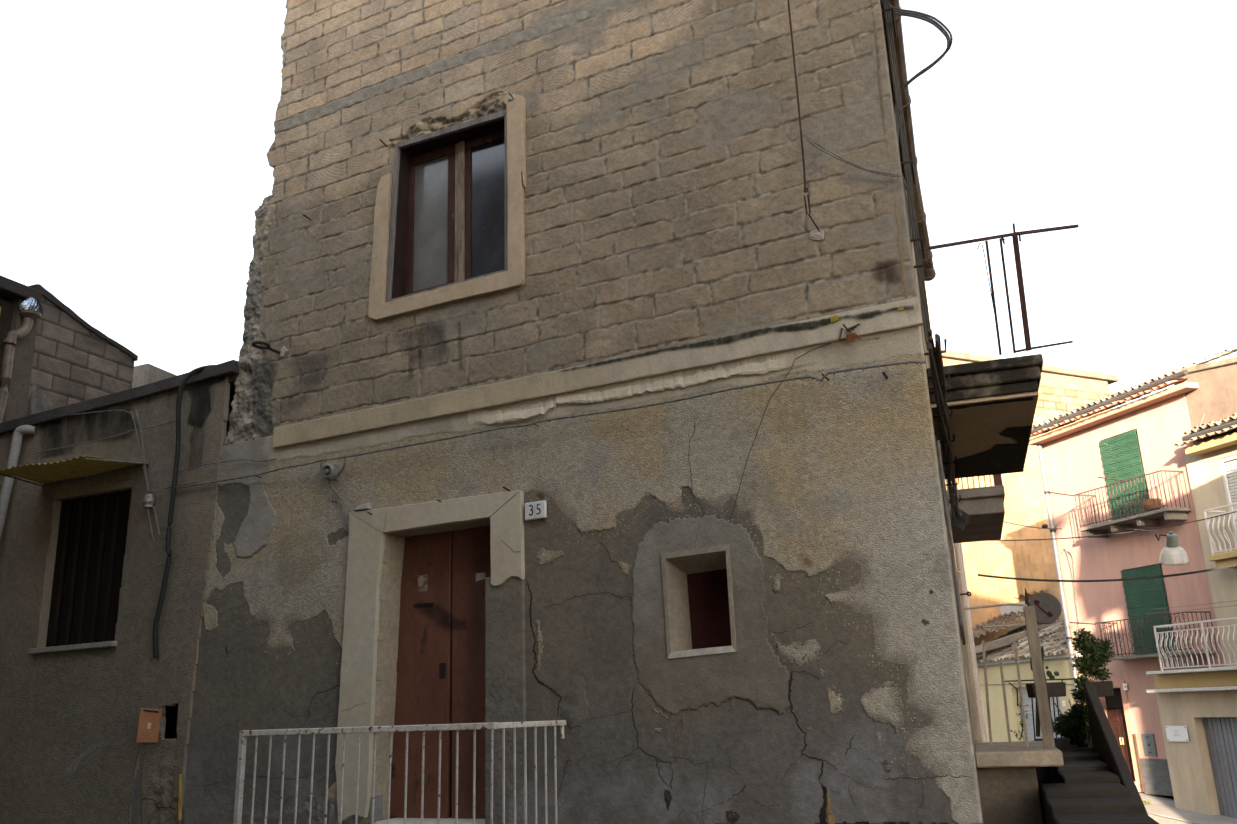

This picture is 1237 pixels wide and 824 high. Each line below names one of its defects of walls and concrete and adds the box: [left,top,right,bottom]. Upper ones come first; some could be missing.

peeling [181,483,342,824]
peeling [327,526,349,546]
crack [502,540,631,715]
peeling [524,487,957,824]
crack [554,621,971,824]